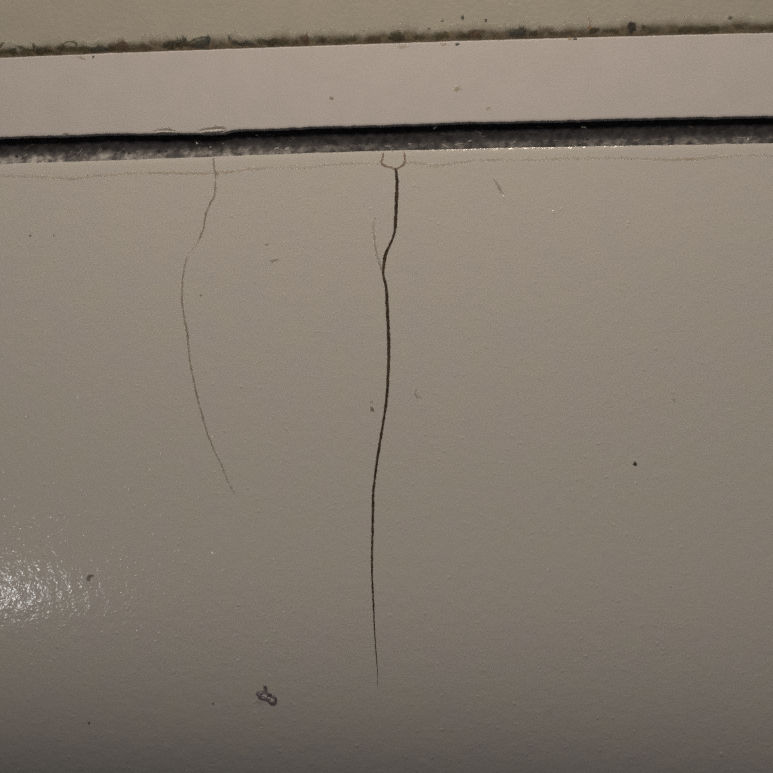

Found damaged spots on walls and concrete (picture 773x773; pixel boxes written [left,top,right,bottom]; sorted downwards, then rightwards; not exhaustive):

crack [371,152,406,674]